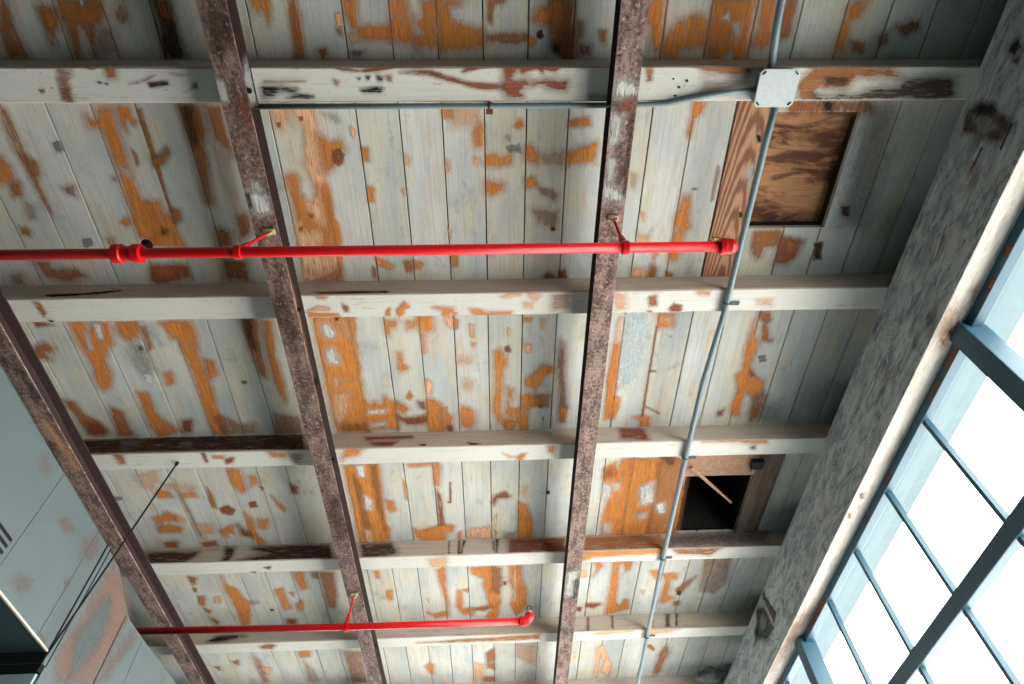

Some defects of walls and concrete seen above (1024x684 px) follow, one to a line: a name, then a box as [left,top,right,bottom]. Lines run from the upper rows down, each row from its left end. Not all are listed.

peeling [407,0,590,97]
peeling [788,67,954,113]
corrosion [622,98,635,194]
peeling [62,318,305,493]
peeling [262,87,476,557]
peeling [493,344,568,430]
peeling [621,296,674,440]
peeling [717,312,773,422]
peeling [147,512,332,573]
peeling [428,558,527,619]
peeling [408,462,565,553]
peeling [573,457,721,614]